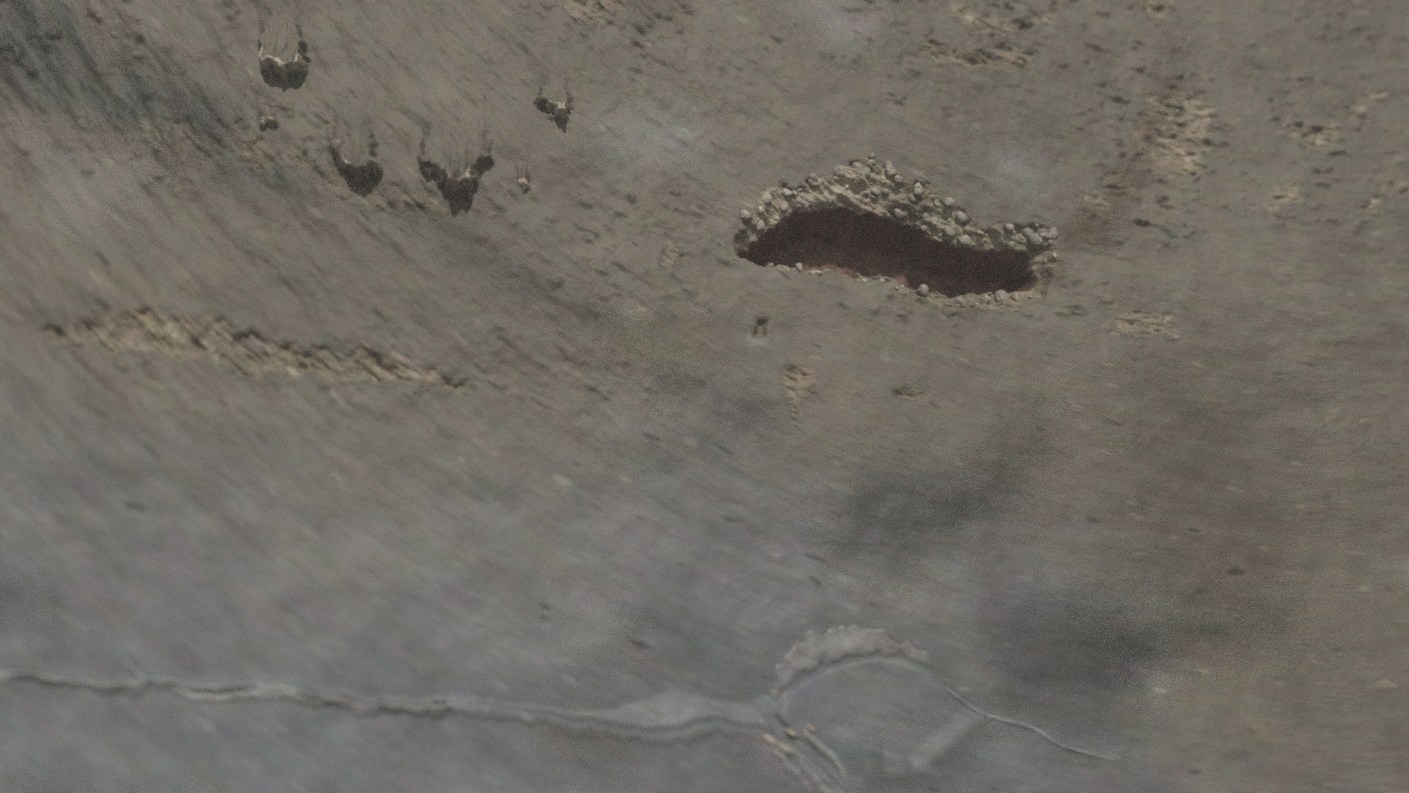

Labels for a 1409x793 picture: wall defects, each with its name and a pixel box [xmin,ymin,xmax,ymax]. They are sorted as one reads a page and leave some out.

peeling [256,0,311,128]
peeling [313,84,495,225]
peeling [533,54,574,122]
spalling [728,152,1064,317]
spalling [27,302,489,402]
crack [0,658,847,793]